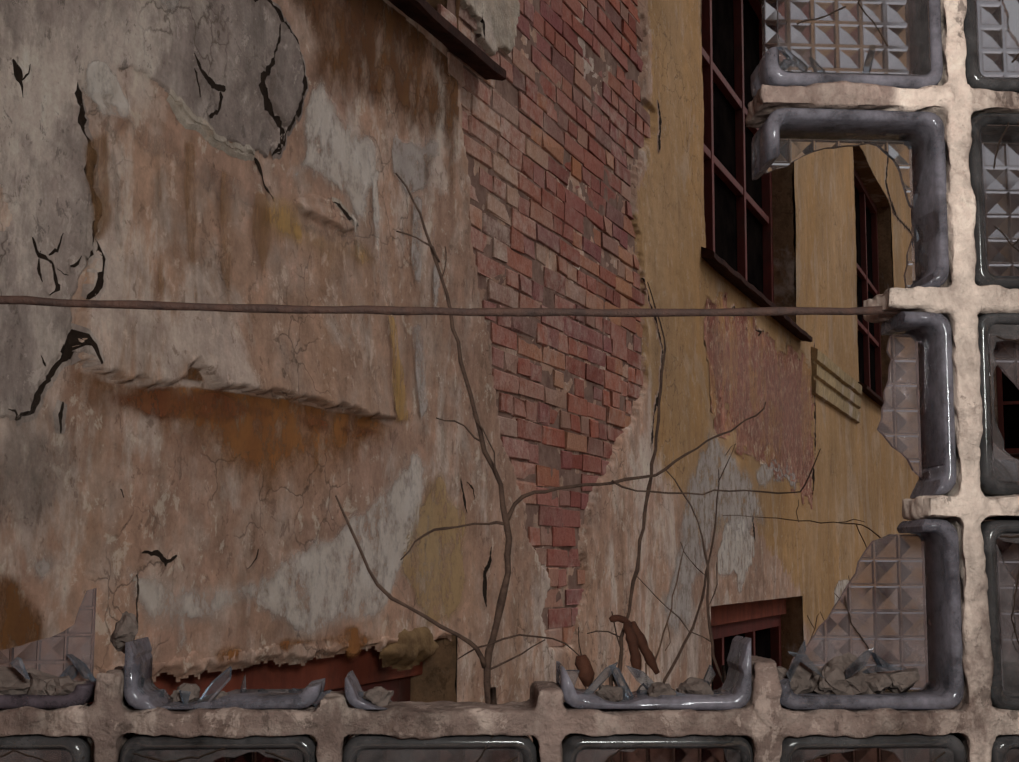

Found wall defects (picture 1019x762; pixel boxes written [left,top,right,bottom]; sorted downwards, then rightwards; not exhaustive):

crack [6,323,105,434]
crack [27,81,108,300]
flaking render [0,0,304,418]
flaking render [294,194,358,234]
flaking render [437,0,651,647]
spalling [665,292,815,628]
crack [993,122,1019,168]
crack [994,226,1019,252]
spalling [152,476,465,682]
peeling [834,580,849,605]